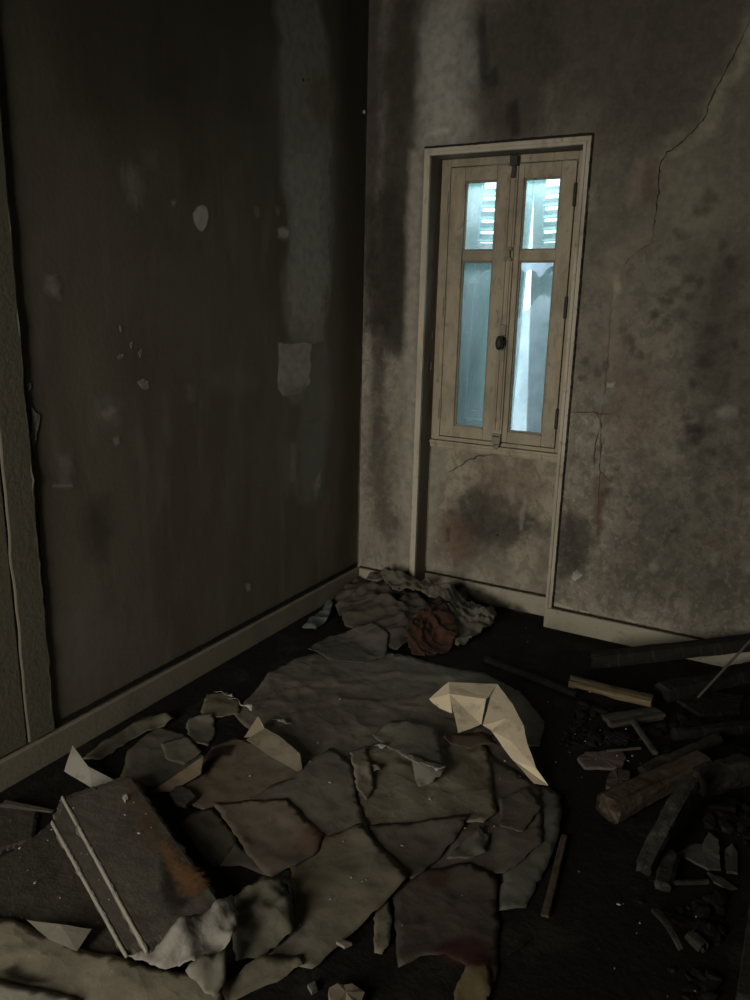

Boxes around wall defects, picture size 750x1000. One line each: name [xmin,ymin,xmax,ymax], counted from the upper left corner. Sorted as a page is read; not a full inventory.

flaking render [193,205,209,232]
damp [276,0,332,396]
crack [424,133,704,639]
crack [625,21,750,264]